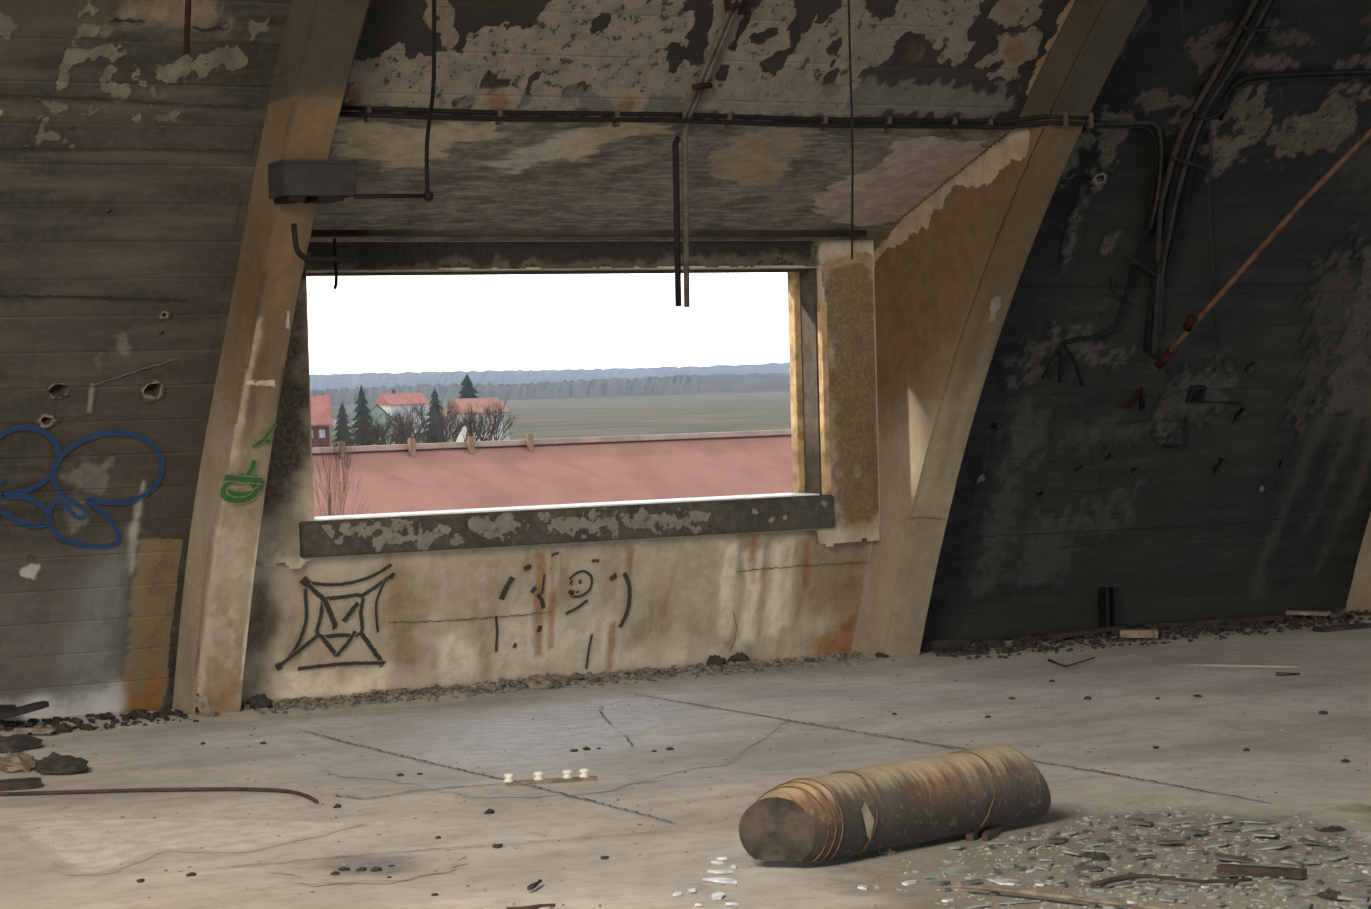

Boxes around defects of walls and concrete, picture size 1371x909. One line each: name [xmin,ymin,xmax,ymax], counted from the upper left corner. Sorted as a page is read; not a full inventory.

peeling [24,0,271,151]
peeling [328,0,1076,272]
peeling [1053,0,1371,457]
corrosion [108,656,173,714]
peeling [141,536,186,668]
corrosion [195,660,242,715]
peeling [194,309,724,717]
corrosion [526,545,563,665]
corrosion [600,616,623,673]
corrosion [620,541,640,586]
peeling [751,507,788,524]
corrosion [793,587,863,658]